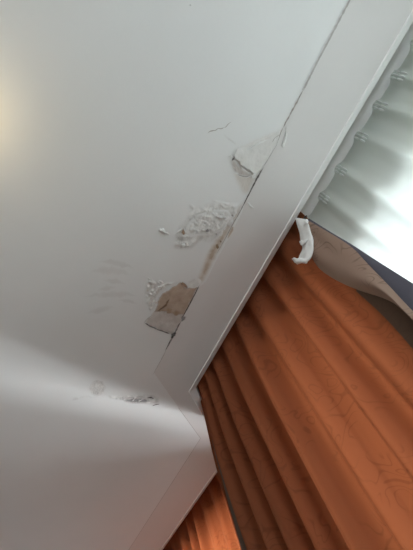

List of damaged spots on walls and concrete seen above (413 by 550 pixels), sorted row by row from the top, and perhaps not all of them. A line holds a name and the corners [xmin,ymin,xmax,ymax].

peeling [228,128,282,196]
crack [216,0,351,255]
water stain [196,199,246,287]
peeling [145,278,202,334]